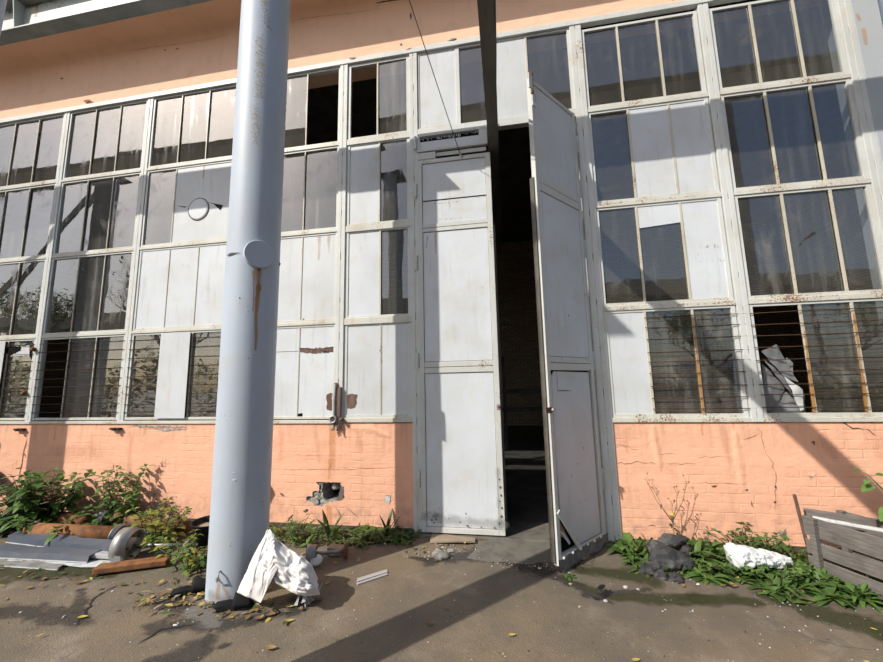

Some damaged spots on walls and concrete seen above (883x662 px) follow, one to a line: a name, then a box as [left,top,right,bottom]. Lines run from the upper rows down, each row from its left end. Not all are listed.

corrosion [252,269,261,350]
spalling [303,477,349,517]
crack [746,422,777,512]